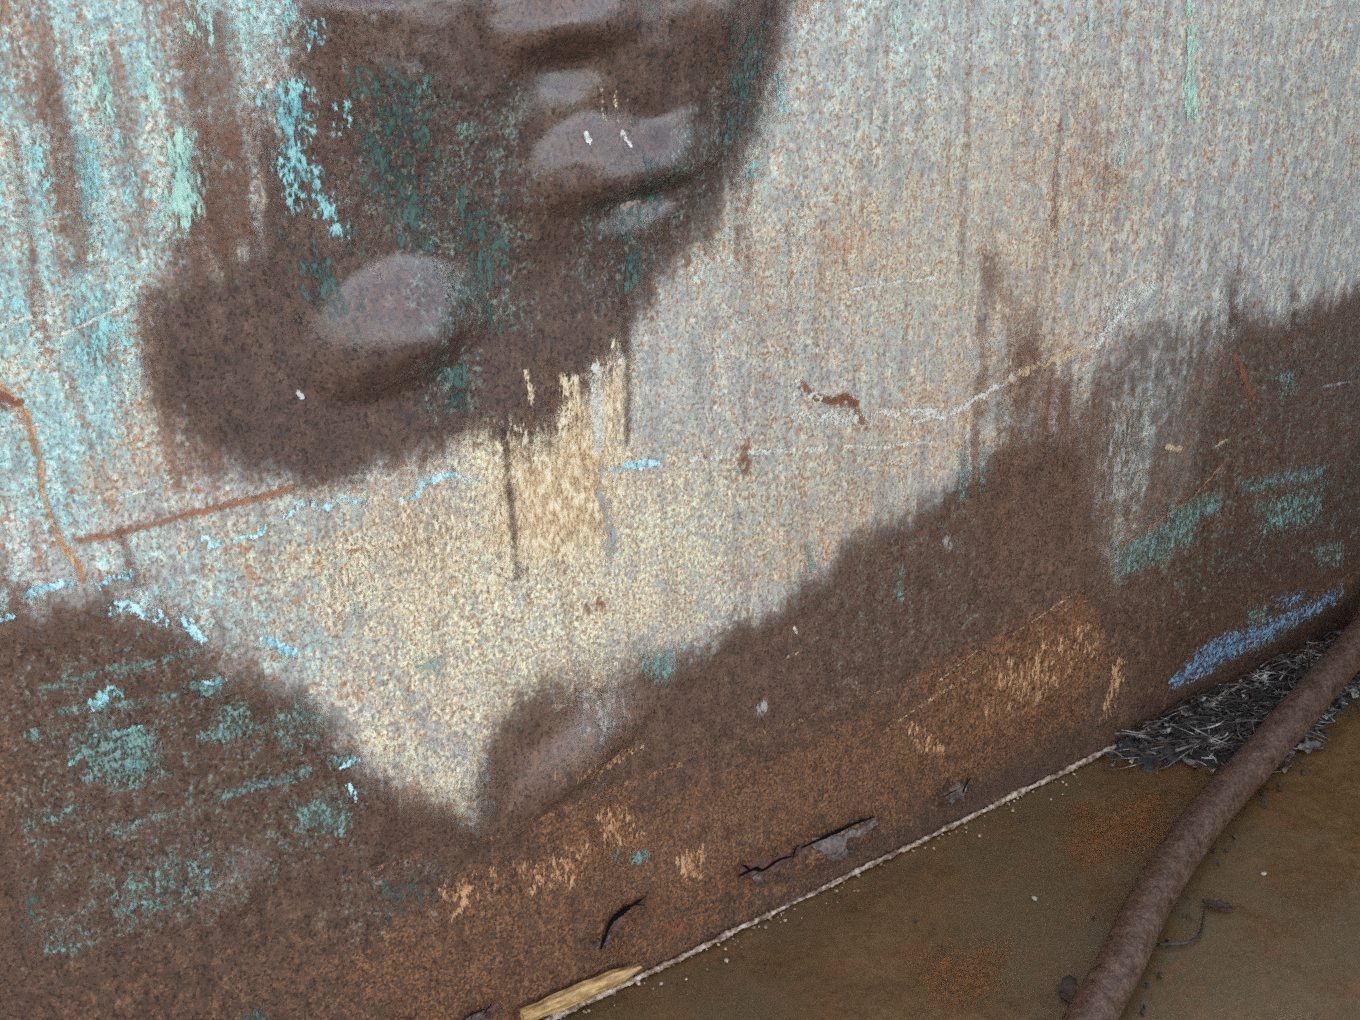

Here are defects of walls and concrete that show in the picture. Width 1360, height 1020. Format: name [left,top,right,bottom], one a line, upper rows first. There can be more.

leakage [146,0,795,580]
leakage [0,280,1360,1020]
rust [985,622,1128,719]
rust [907,721,944,756]
crack [585,894,646,959]